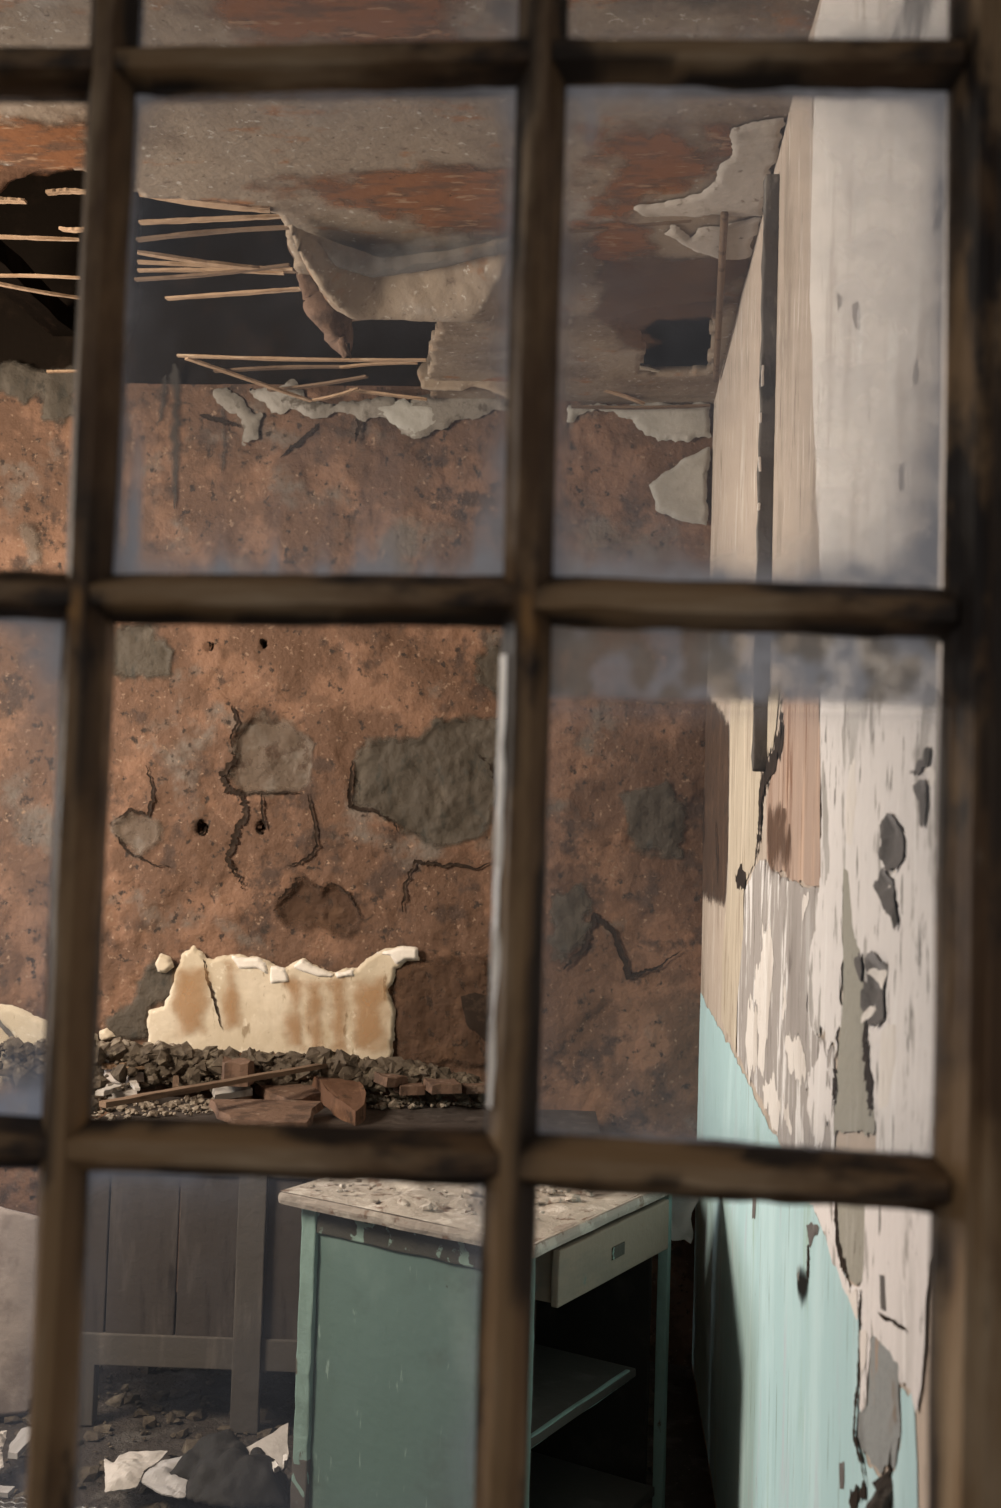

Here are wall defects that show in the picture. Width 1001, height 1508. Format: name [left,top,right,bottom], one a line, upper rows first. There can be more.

peeling [814,0,948,39]
flaking render [634,118,786,260]
peeling [810,104,947,588]
spalling [0,361,75,424]
flaking render [213,379,507,446]
spalling [114,625,173,678]
spalling [475,644,502,697]
spalling [347,716,498,847]
spalling [111,811,162,853]
peeling [702,643,941,1155]
peeling [797,1269,808,1301]
peeling [806,1205,930,1508]